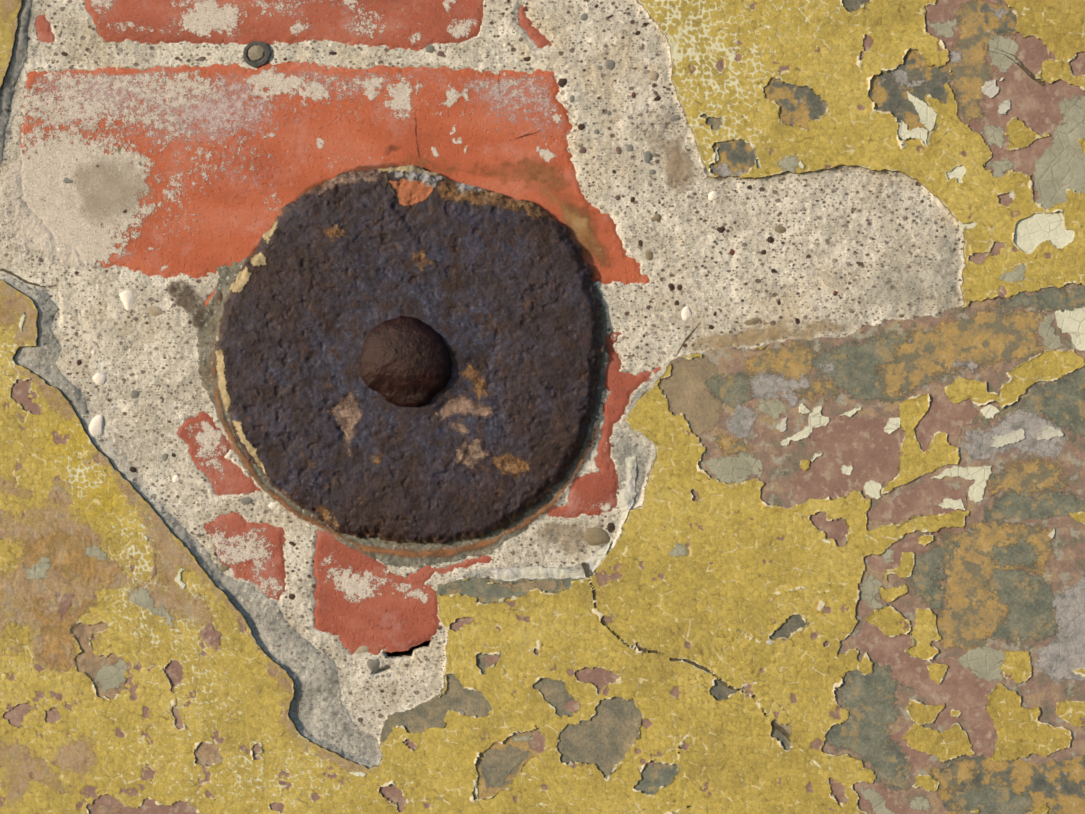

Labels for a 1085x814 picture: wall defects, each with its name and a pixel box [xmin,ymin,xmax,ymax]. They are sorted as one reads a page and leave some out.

corrosion [561,204,606,265]
flaking render [0,0,492,777]
corrosion [215,388,599,557]
flaking render [268,0,1085,814]
crack [581,562,791,741]
peeling [0,703,96,803]